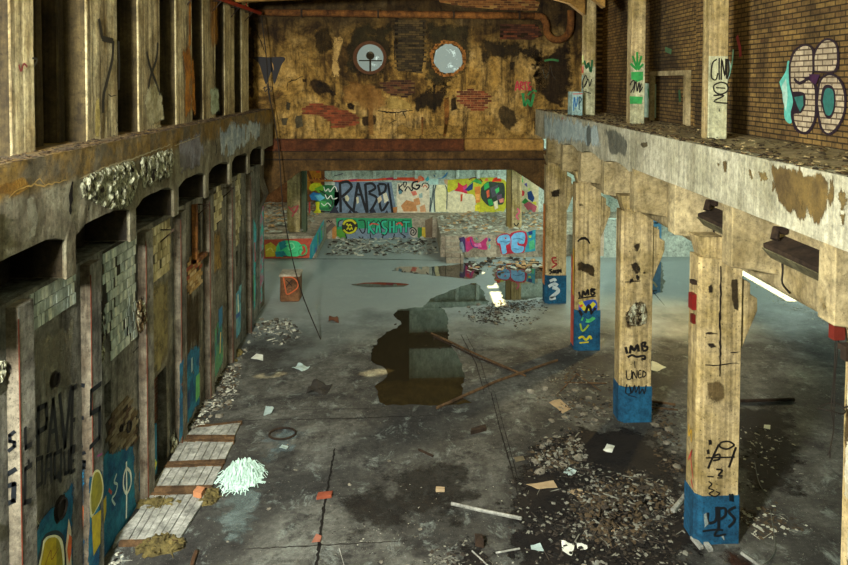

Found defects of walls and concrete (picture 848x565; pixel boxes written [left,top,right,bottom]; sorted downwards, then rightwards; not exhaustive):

flaking render [379,20,426,110]
flaking render [456,89,492,111]
flaking render [302,103,359,128]
spalling [80,148,175,211]
peeling [838,191,848,225]
spalling [626,302,647,326]
spalling [0,360,11,383]
crack [278,408,437,420]
crack [252,448,398,565]